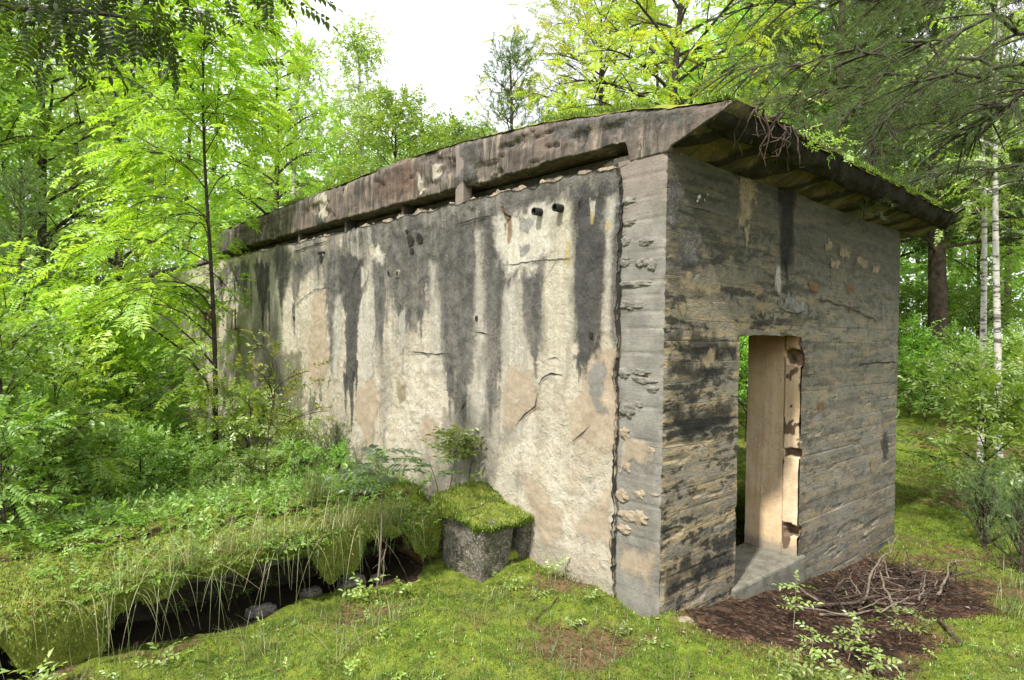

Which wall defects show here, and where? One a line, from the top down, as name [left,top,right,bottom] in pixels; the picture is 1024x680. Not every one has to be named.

leakage [215,182,621,474]
crack [518,357,560,422]
crack [574,179,633,579]
leakage [775,188,807,314]